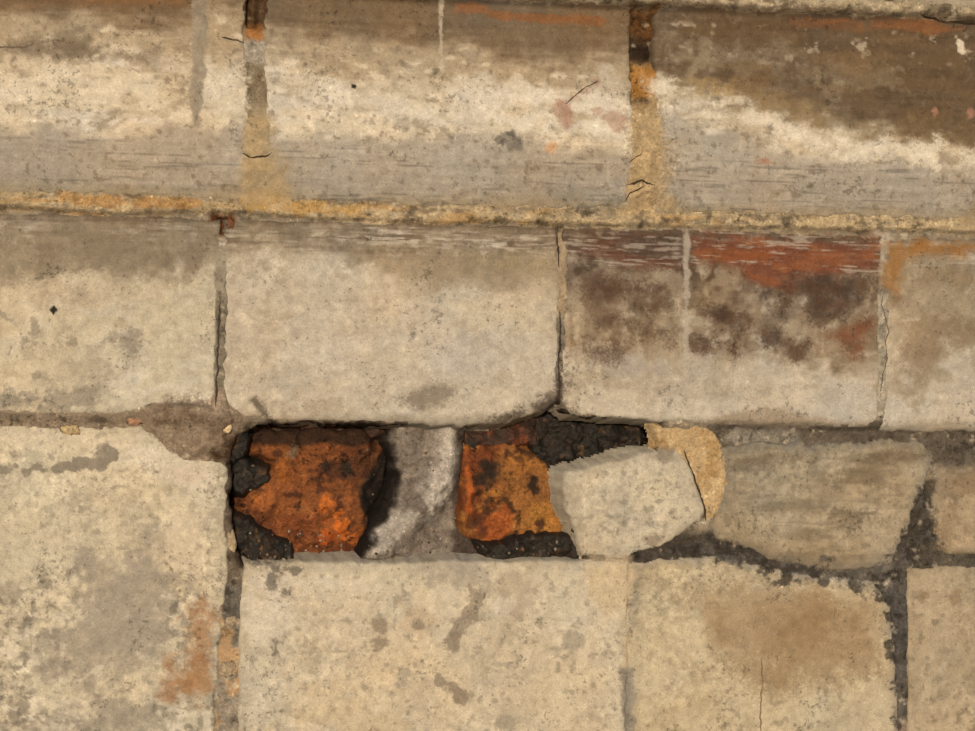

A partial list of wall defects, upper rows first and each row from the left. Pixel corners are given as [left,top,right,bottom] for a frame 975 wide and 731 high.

damp [636,1,975,181]
damp [293,219,975,399]
rust [566,222,975,307]
rust [823,308,881,369]
crack [880,292,890,395]
spalling [229,427,386,553]
spalling [455,443,704,556]
rust [150,591,232,715]
damp [660,569,903,720]